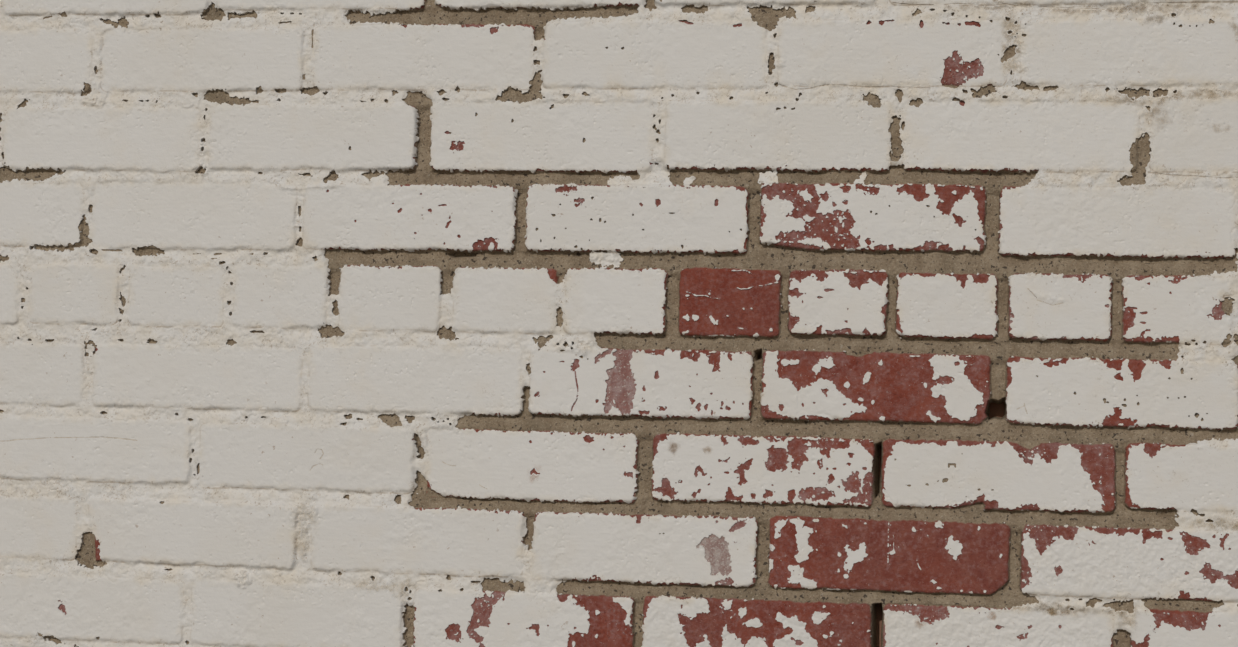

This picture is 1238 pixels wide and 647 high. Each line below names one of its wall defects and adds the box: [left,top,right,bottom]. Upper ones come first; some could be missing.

spalling [193,86,286,111]
spalling [301,74,328,96]
peeling [912,9,1059,106]
spalling [0,113,66,183]
spalling [299,171,339,192]
spalling [31,205,165,273]
peeling [313,87,1238,647]
spalling [76,532,107,569]